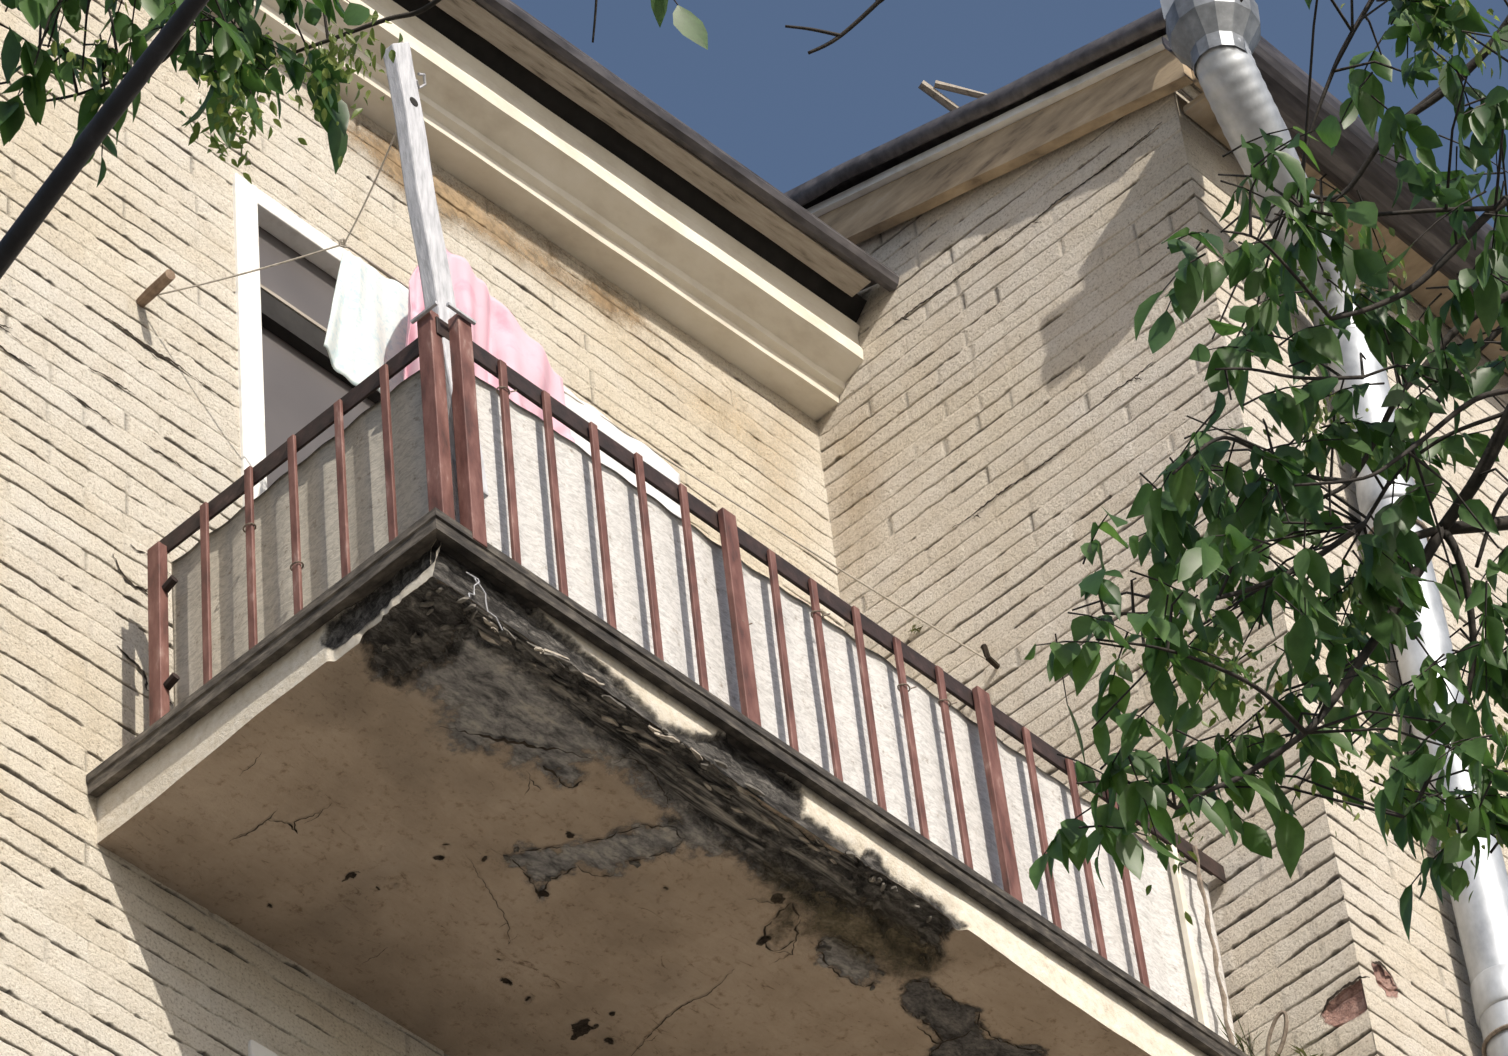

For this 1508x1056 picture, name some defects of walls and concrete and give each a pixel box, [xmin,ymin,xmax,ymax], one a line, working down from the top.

crack [229,808,326,842]
spalling [321,542,1048,1056]
spalling [1320,961,1398,1028]